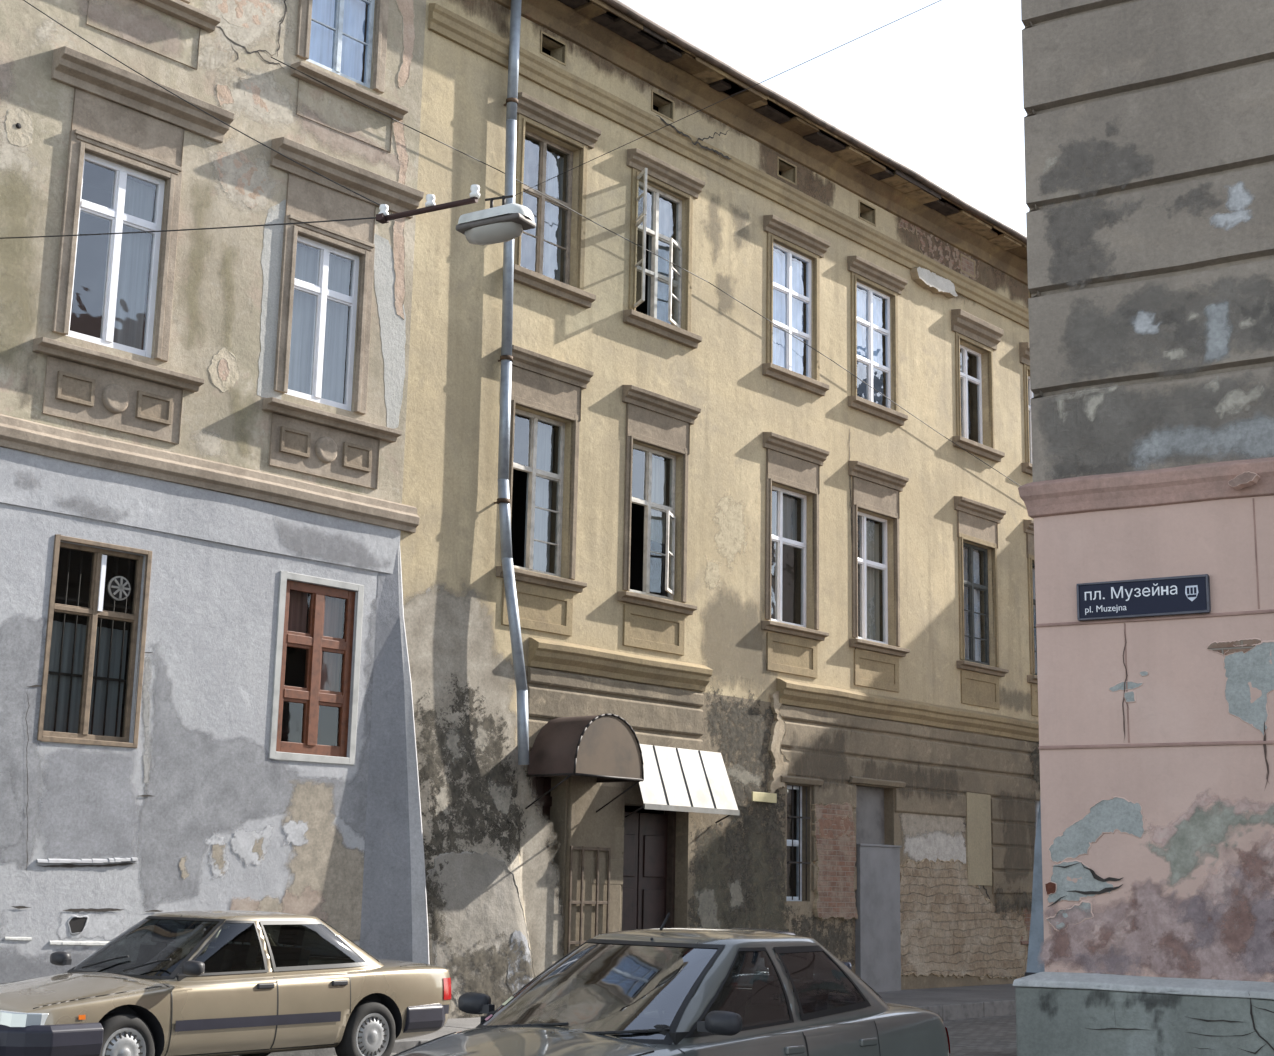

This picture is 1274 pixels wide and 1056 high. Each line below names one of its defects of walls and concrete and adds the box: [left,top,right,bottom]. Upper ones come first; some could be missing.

crack [216,0,287,69]
damp [1134,311,1159,333]
damp [1189,302,1269,361]
damp [1055,382,1274,478]
crack [1121,631,1129,739]
peeling [1207,638,1274,737]
spalling [66,915,89,935]
peeling [206,782,364,942]
damp [414,674,535,1018]
damp [687,687,854,970]
flaking render [811,802,858,920]
flaking render [1019,796,1274,981]